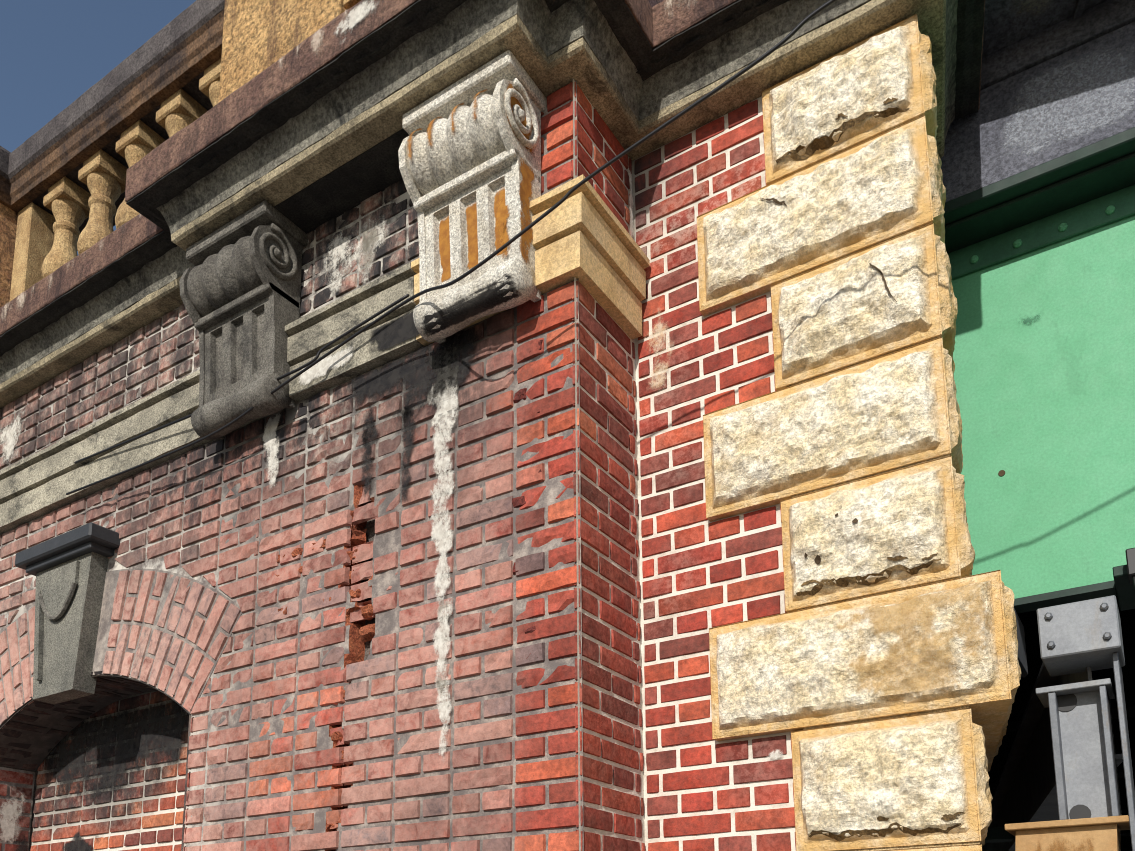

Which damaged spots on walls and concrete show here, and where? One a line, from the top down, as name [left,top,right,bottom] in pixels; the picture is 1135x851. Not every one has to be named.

spalling [775,97,909,163]
corrosion [494,81,534,262]
corrosion [439,216,451,282]
corrosion [466,203,478,270]
crack [869,263,897,302]
damp [263,414,280,485]
damp [361,408,378,496]
damp [400,407,415,502]
spalling [347,529,375,643]
damp [427,343,459,754]
spalling [796,553,941,596]
spalling [809,812,965,842]